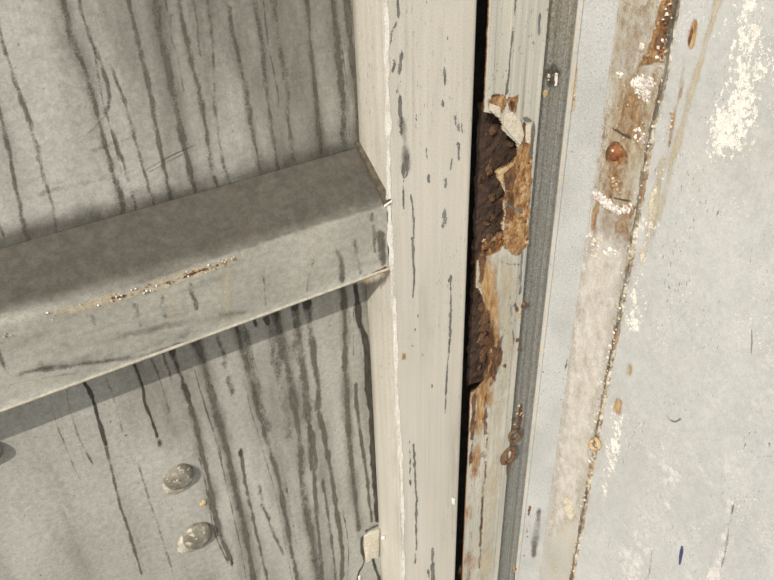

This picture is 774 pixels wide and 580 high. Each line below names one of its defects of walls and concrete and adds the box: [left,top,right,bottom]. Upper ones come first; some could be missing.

rust [488,70,536,256]
rust [591,0,674,238]
rust [647,0,722,240]
peeling [477,302,494,371]
rust [464,255,512,580]
peeling [501,250,527,352]